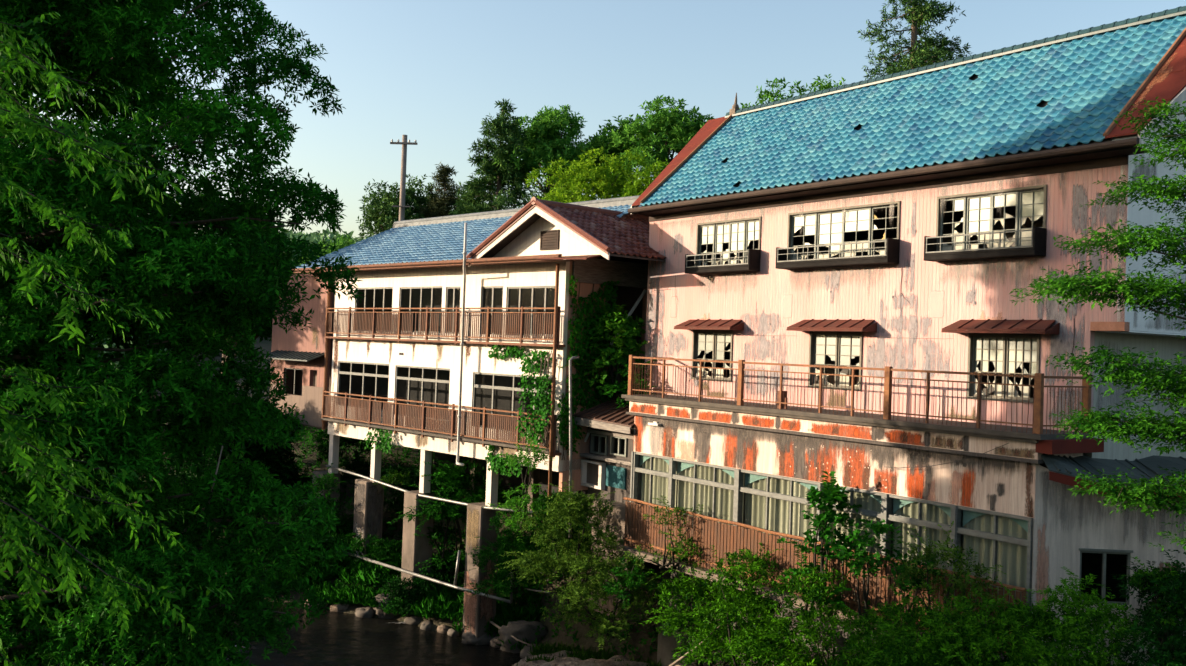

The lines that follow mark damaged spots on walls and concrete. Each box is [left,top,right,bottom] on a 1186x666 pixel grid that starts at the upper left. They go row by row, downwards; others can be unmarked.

rust [1129,53,1177,114]
peeling [907,203,916,237]
peeling [741,309,789,399]
rust [827,389,846,407]
peeling [866,253,954,387]
peeling [1037,184,1125,424]
rust [630,404,963,501]
rust [950,470,976,507]
damp [1036,473,1103,621]